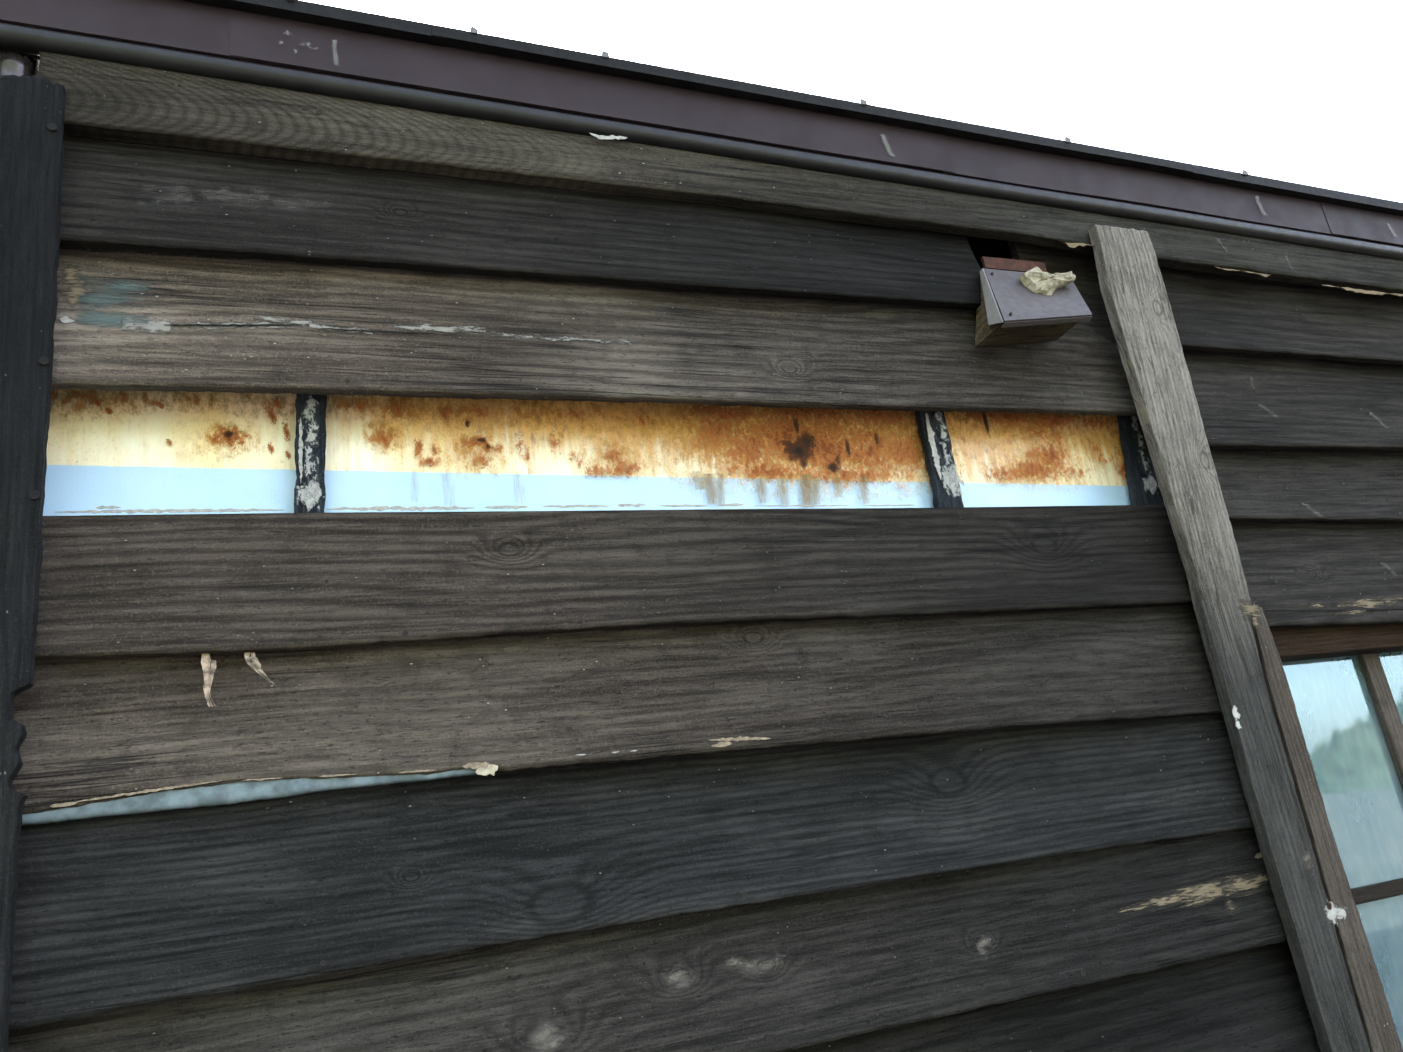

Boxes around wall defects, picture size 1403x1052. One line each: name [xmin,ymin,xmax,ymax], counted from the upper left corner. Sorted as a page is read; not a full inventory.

corrosion [51,389,225,415]
corrosion [206,425,247,449]
corrosion [241,393,295,458]
corrosion [327,395,928,507]
corrosion [950,412,1126,485]